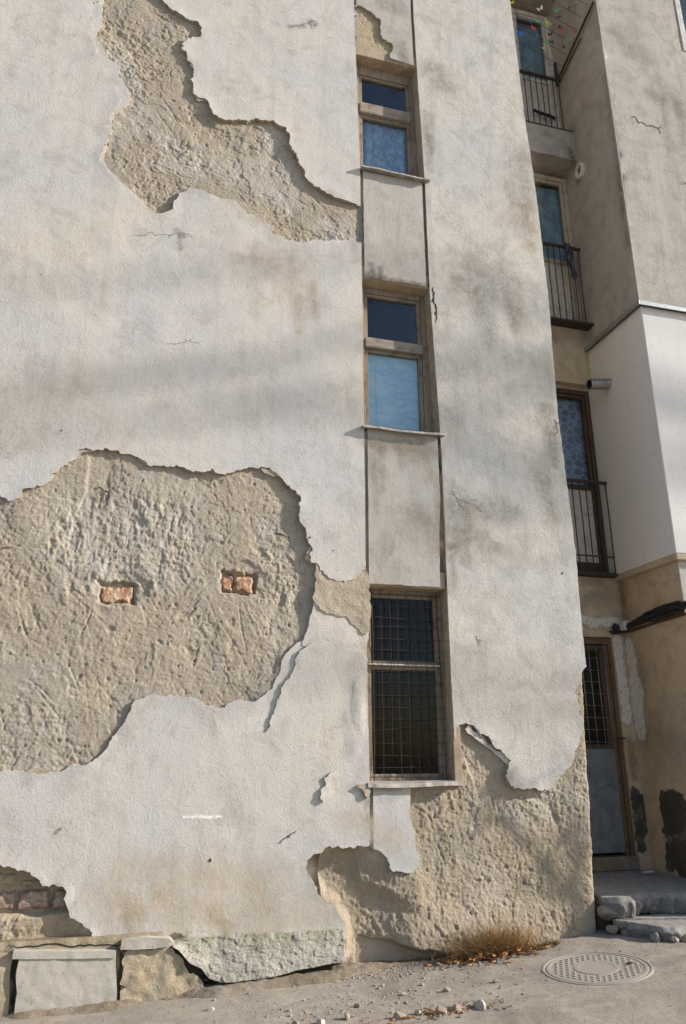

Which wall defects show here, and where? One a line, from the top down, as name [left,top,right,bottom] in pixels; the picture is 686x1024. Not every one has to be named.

flaking render [89,0,359,242]
flaking render [356,7,392,52]
flaking render [0,449,371,774]
damp [624,637,646,742]
flaking render [0,865,92,941]
flaking render [317,673,596,964]